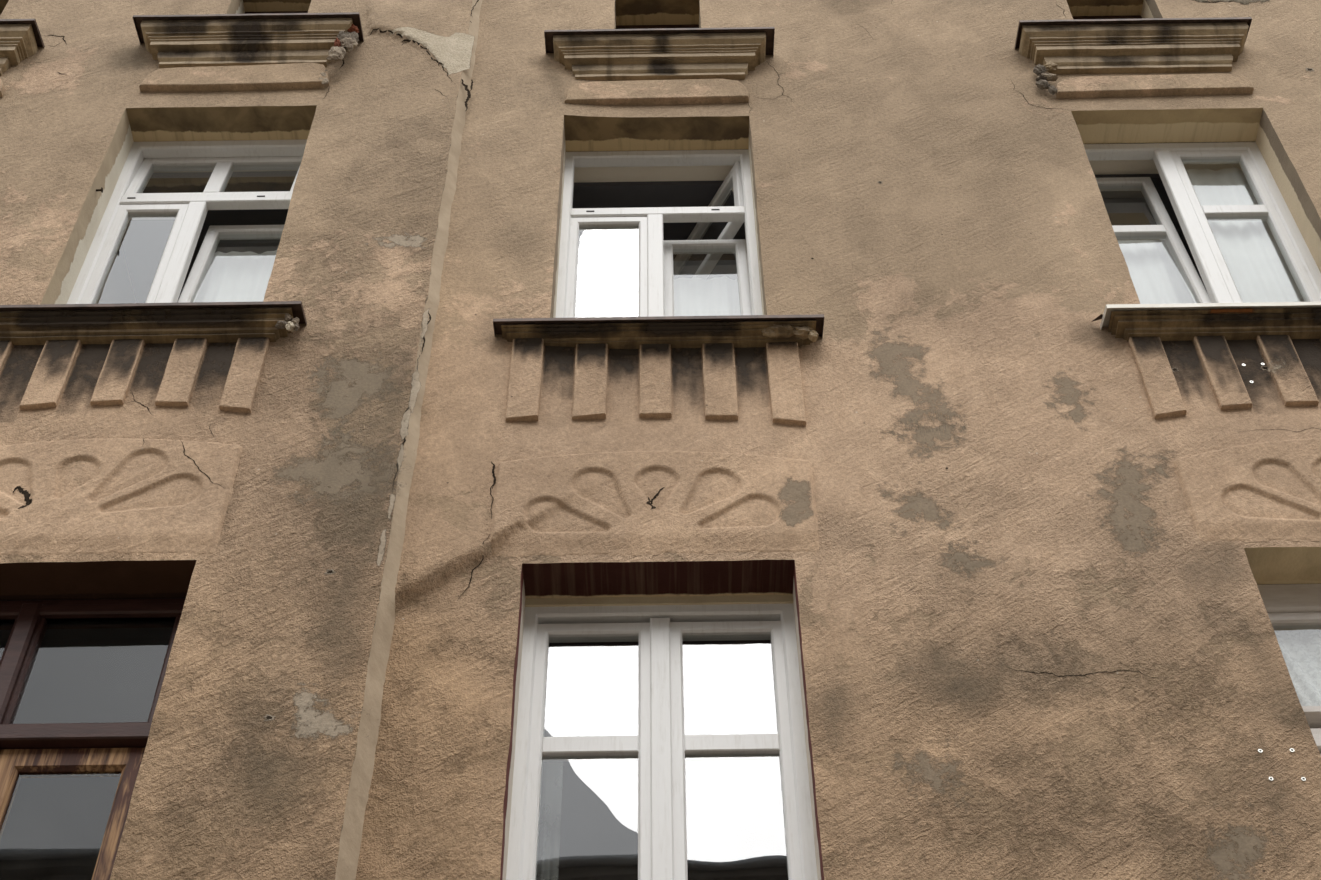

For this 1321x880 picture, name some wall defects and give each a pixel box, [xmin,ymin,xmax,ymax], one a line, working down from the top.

crack [370,28,473,111]
flaking render [389,27,475,75]
crack [181,424,224,488]
crack [462,462,496,594]